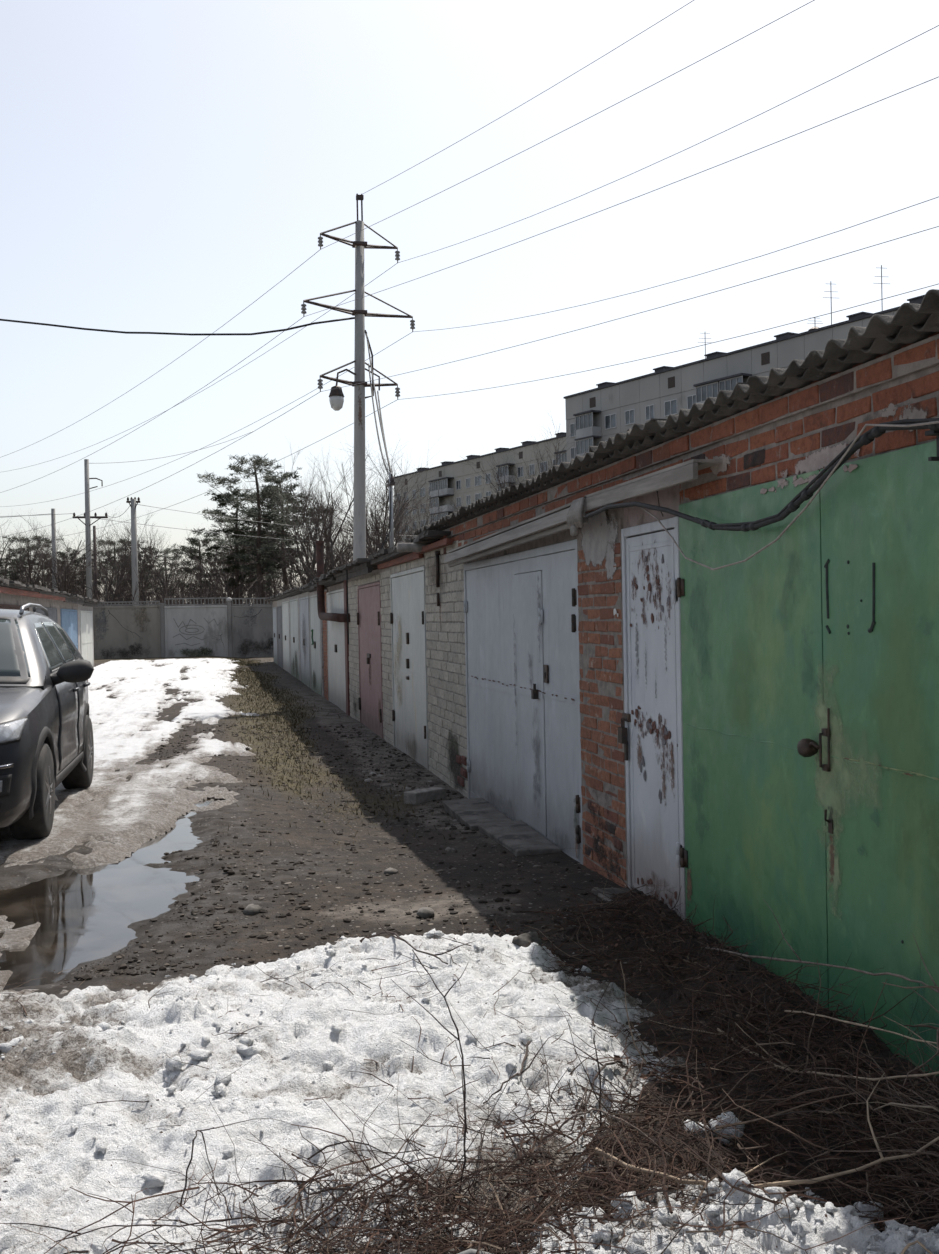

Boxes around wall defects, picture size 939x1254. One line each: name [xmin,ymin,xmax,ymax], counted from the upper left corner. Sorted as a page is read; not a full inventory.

peeling [760,442,860,494]
rust [630,541,672,629]
rust [631,706,678,805]